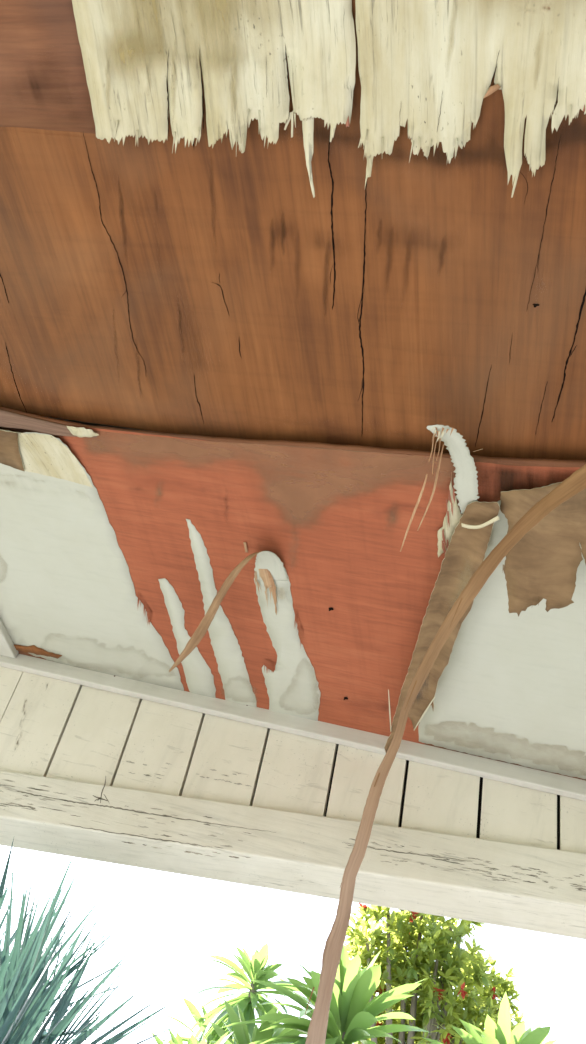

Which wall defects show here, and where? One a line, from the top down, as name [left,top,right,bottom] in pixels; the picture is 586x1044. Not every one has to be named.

crack [6,347,27,413]
crack [83,134,146,370]
peeling [0,0,586,744]
crack [328,139,367,436]
crack [475,332,513,446]
crack [519,136,561,307]
crack [535,290,586,435]